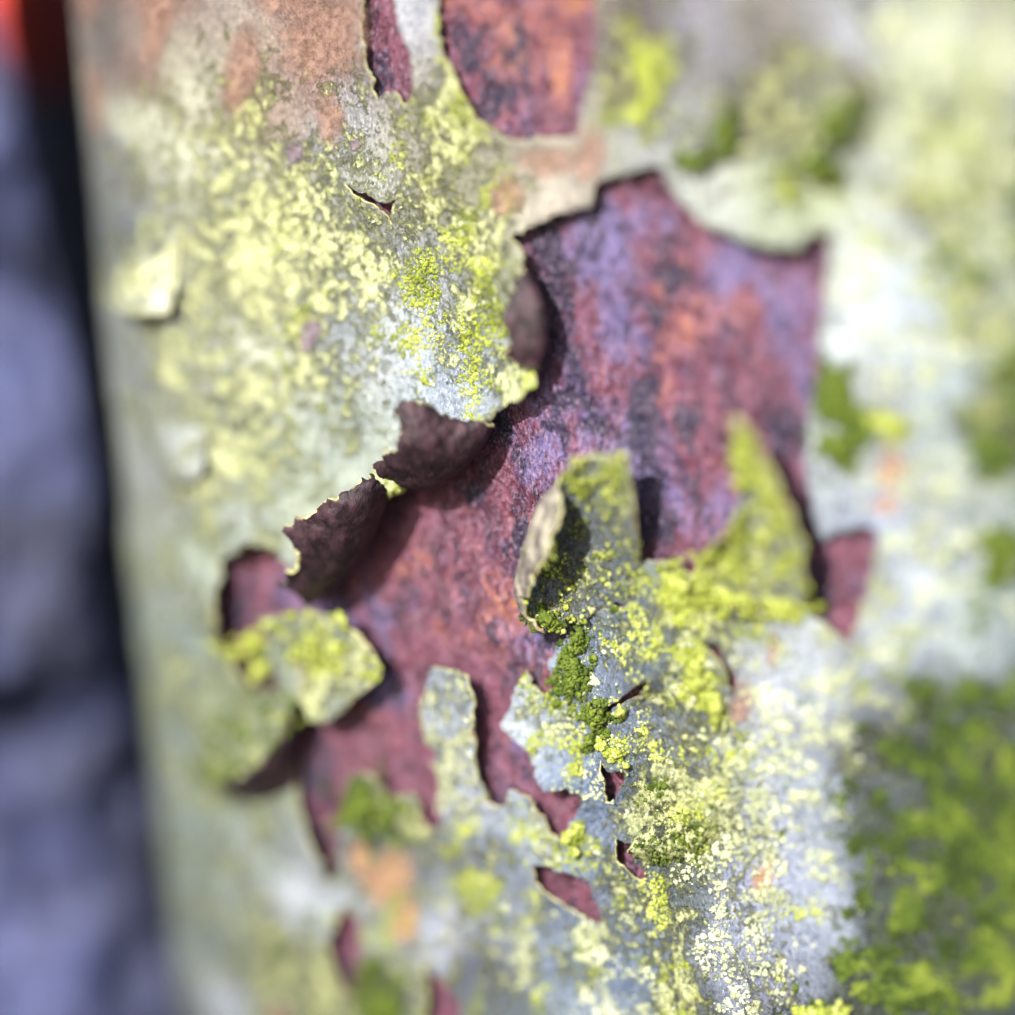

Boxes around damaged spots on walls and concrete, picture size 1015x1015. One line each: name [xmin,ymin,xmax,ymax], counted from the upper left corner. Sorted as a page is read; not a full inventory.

peeling [439,0,597,140]
peeling [186,166,878,881]
peeling [534,865,602,922]